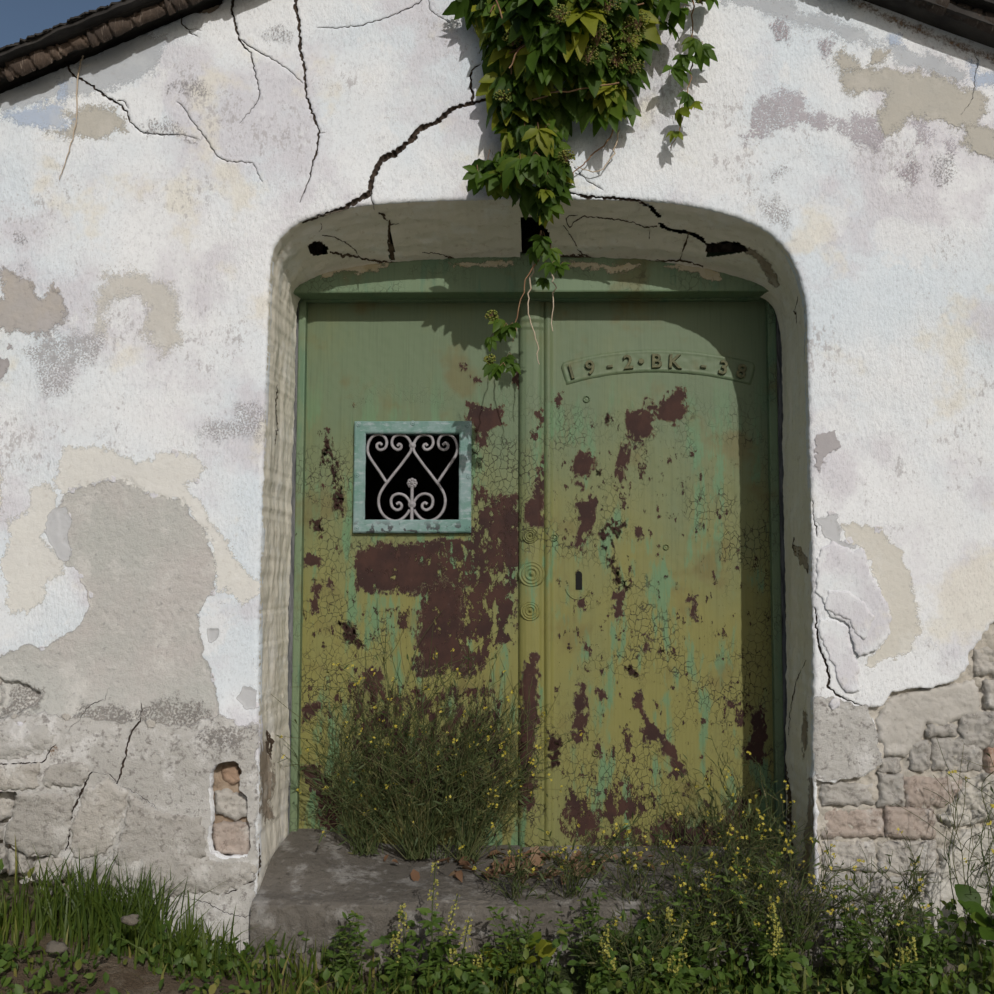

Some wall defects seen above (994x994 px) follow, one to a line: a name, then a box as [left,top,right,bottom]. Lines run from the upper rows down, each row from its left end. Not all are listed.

crack [65,61,262,181]
crack [230,0,486,263]
crack [560,168,703,267]
peeling [0,266,69,379]
crack [65,698,156,851]
flaking render [0,443,260,955]